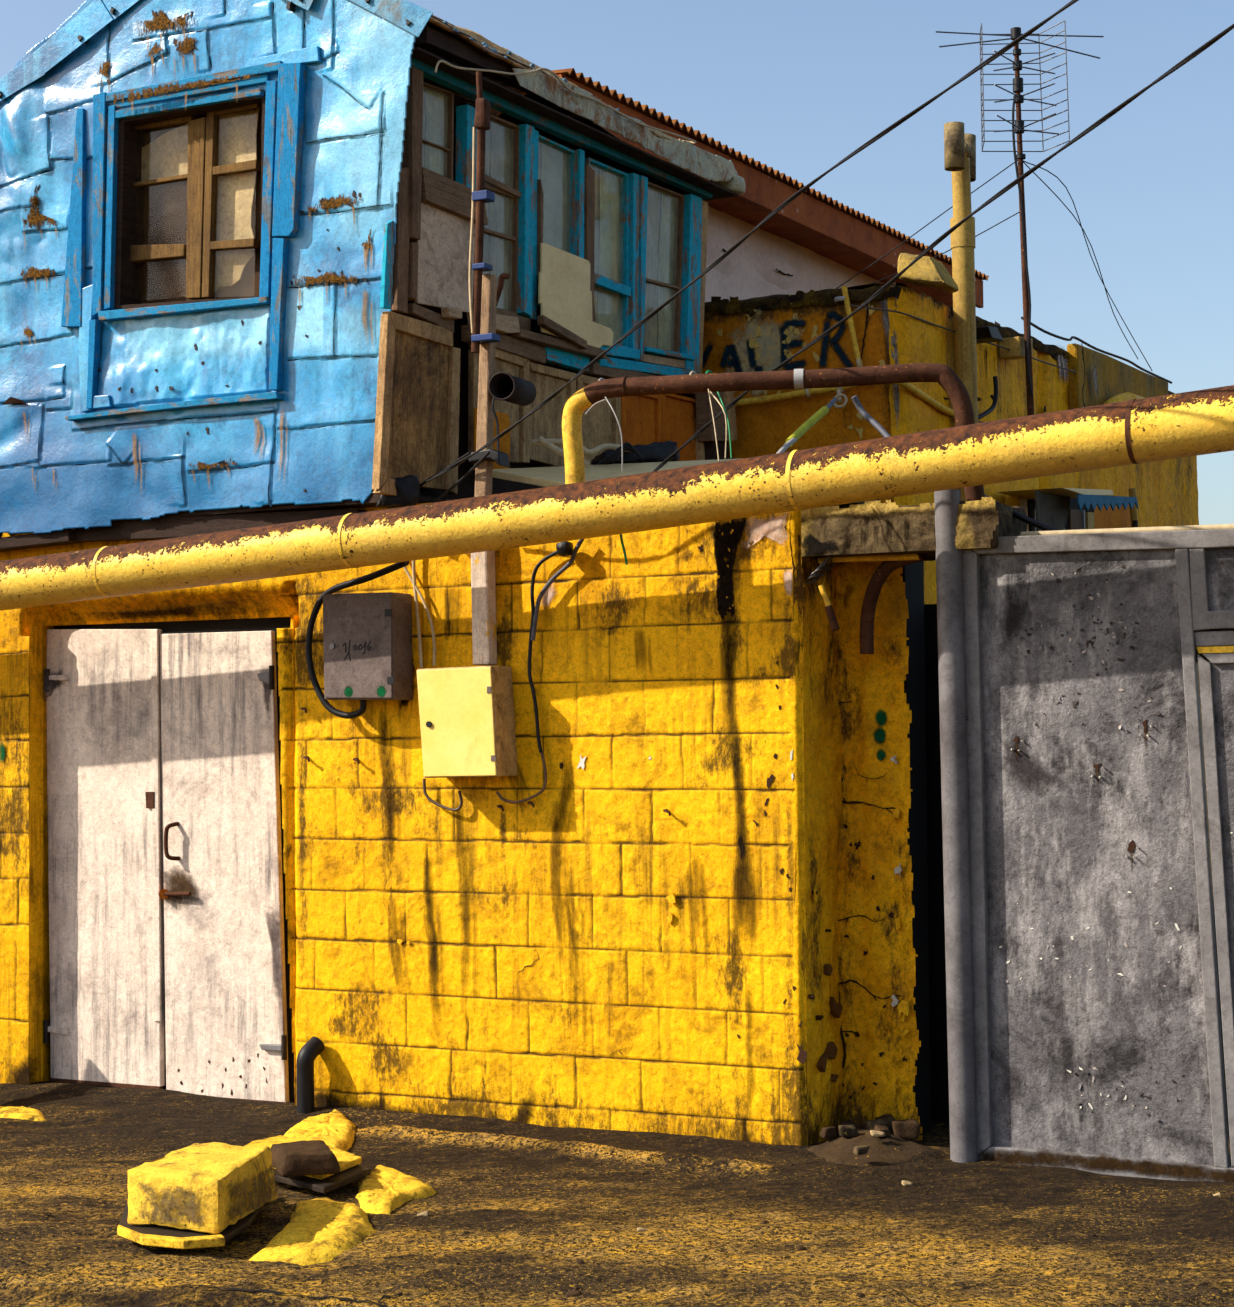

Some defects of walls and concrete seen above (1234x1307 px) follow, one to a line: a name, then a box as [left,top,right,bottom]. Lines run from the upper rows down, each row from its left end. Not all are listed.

corrosion [97,6,259,113]
corrosion [23,184,63,246]
corrosion [308,190,362,222]
corrosion [290,229,374,343]
peeling [704,296,835,373]
damp [713,518,753,950]
damp [423,857,438,1002]
damp [455,804,468,959]
damp [11,1058,38,1085]
damp [314,1091,421,1113]
damp [511,1097,534,1124]
spalling [783,986,910,1099]